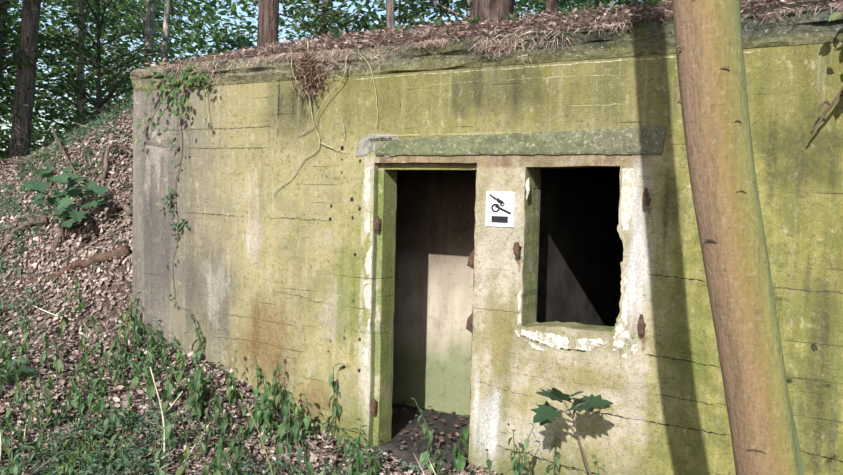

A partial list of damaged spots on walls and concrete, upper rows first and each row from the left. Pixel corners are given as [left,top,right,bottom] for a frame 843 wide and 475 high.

peeling [515,168,643,359]
crack [646,354,718,367]
crack [594,411,729,435]
crack [472,440,599,475]